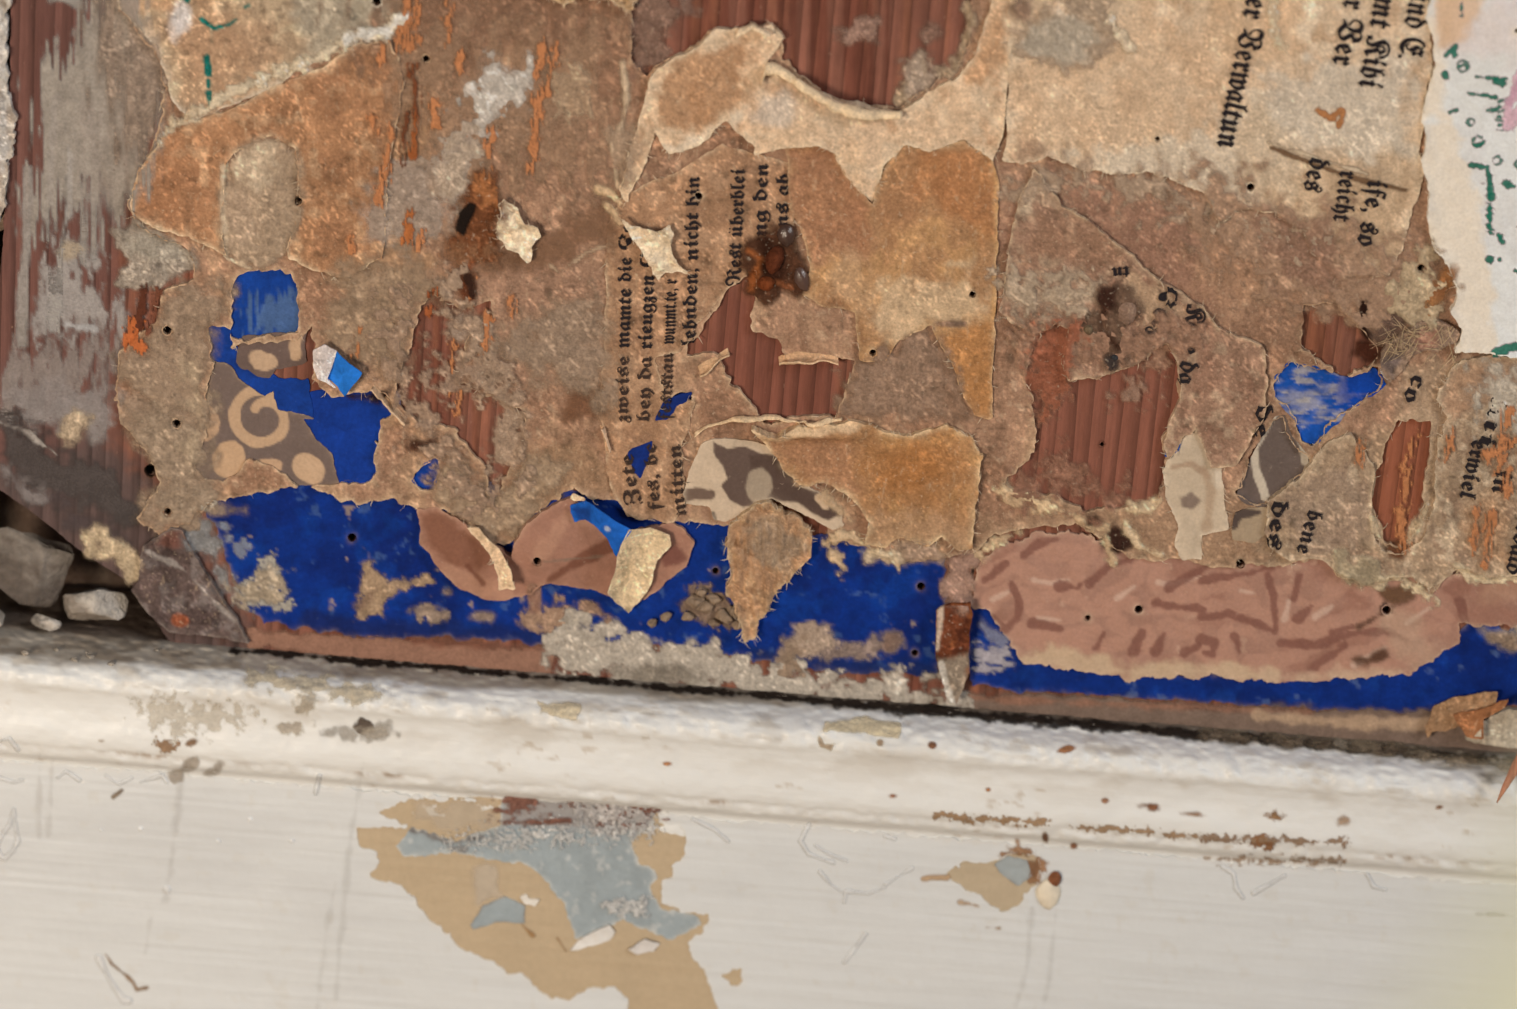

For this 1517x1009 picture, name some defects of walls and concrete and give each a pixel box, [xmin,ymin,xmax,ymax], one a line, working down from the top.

peeling [839,16,880,45]
peeling [492,199,541,263]
spalling [122,283,163,355]
peeling [986,261,1103,328]
peeling [313,344,390,402]
peeling [59,411,94,441]
peeling [1123,498,1163,558]
peeling [935,602,973,704]
peeling [1354,649,1388,665]
spalling [245,665,382,735]
peeling [357,796,742,1009]
peeling [921,840,1047,929]